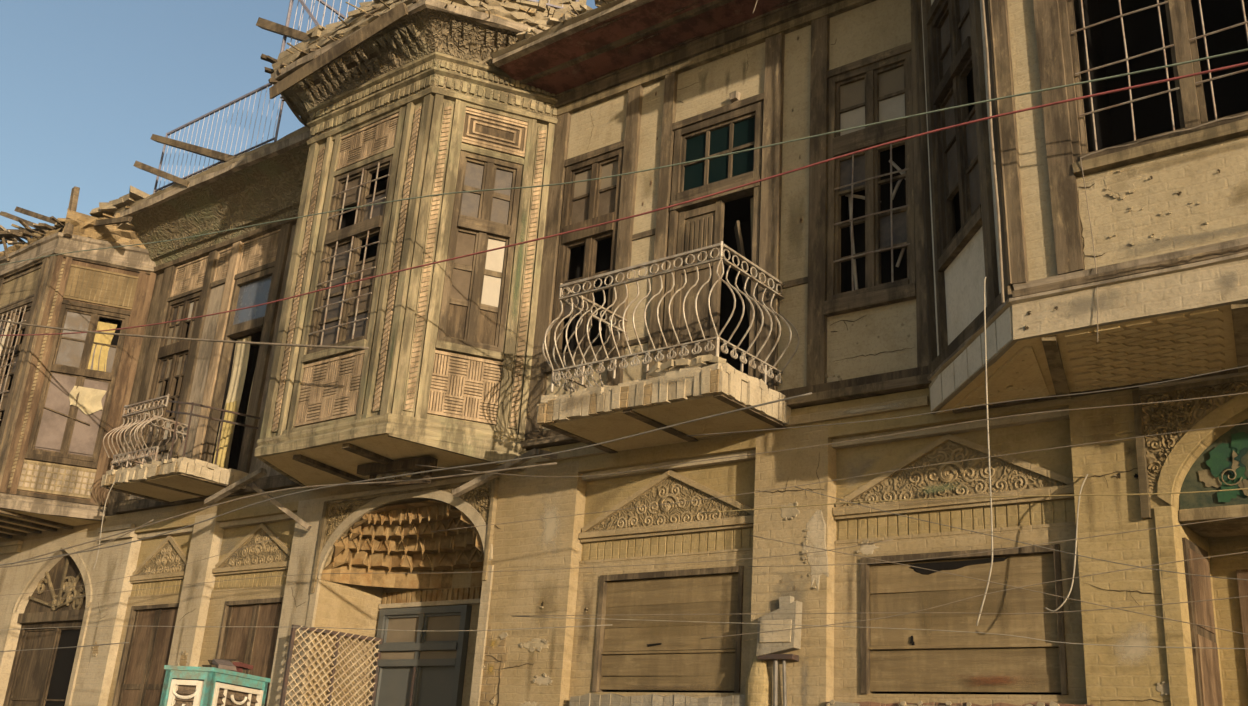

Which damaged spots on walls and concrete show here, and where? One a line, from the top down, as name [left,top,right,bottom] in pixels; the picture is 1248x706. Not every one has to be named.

peeling [1103,166,1142,200]
crack [1078,183,1248,279]
spalling [780,501,829,591]